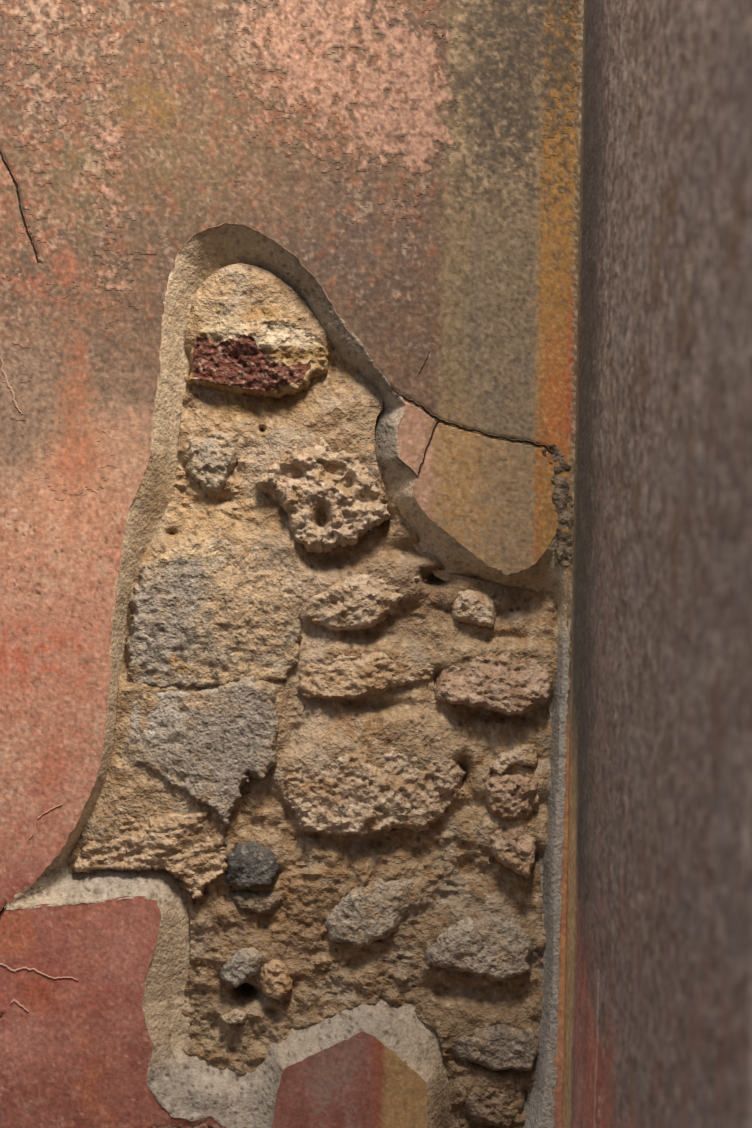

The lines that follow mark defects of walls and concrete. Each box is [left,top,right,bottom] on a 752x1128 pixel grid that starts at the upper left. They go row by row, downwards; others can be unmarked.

crack [0,149,39,263]
crack [385,351,553,477]
flaking render [2,223,573,1128]
crack [0,963,77,980]